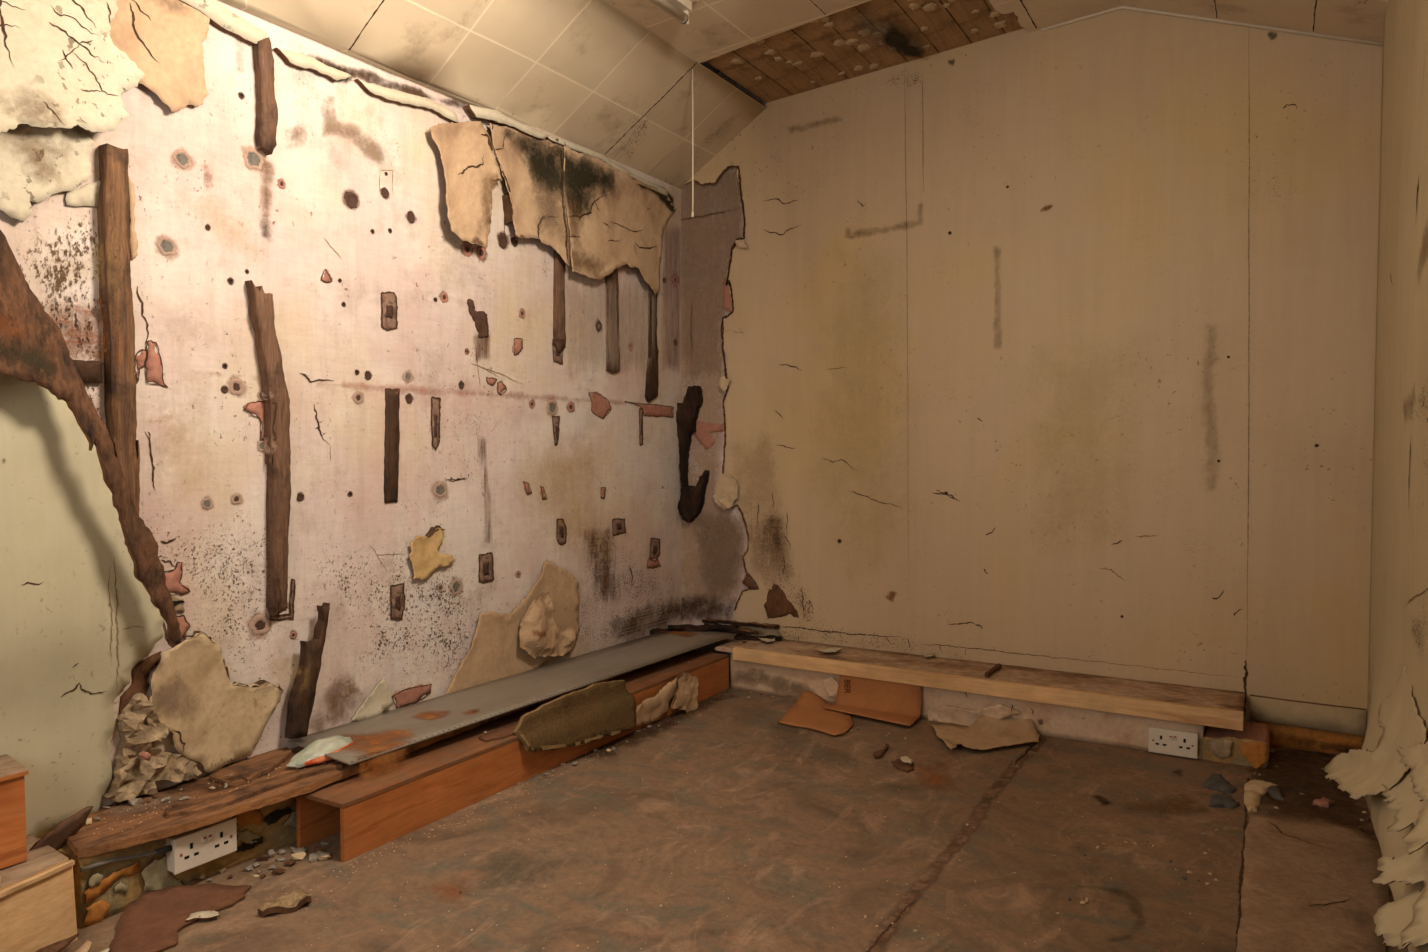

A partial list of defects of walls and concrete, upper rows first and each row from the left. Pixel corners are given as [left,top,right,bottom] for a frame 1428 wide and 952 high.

crack [0,0,158,123]
water stain [858,16,924,88]
spalling [343,190,359,209]
spalling [461,232,525,261]
water stain [506,115,658,271]
flaking render [134,340,168,388]
flaking render [221,363,277,452]
flaking render [529,165,759,670]
water stain [575,160,741,657]
peeling [102,562,284,802]
peeling [350,560,580,721]
peeling [1324,666,1428,950]